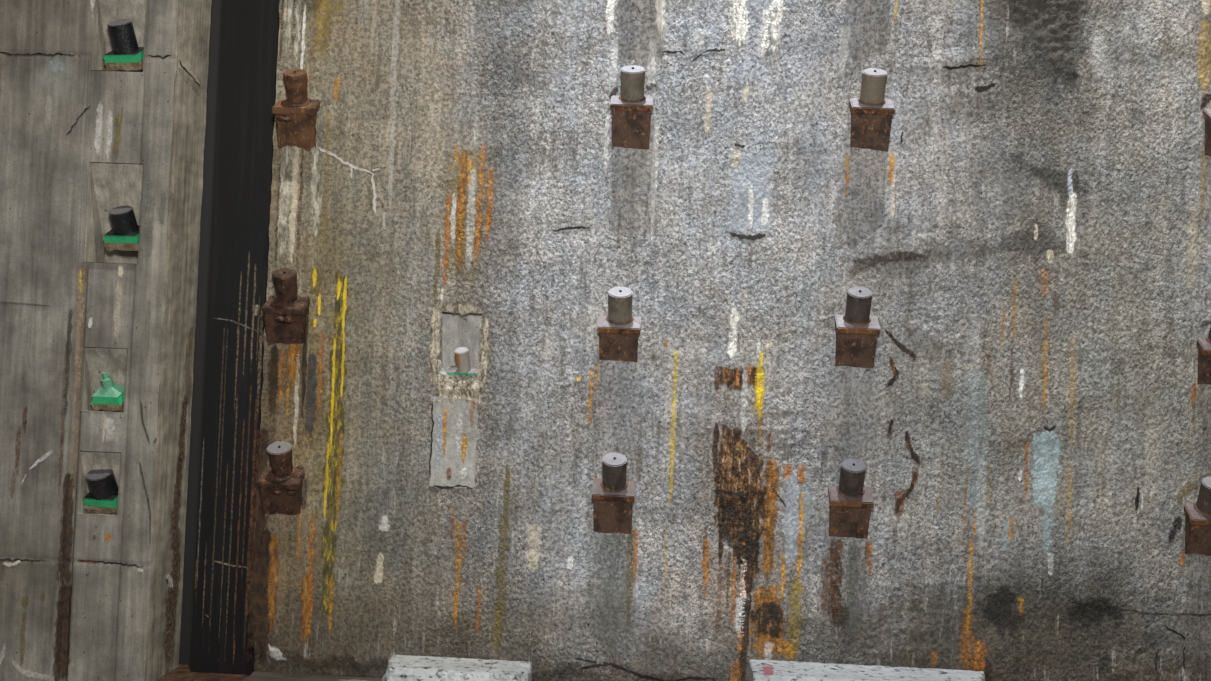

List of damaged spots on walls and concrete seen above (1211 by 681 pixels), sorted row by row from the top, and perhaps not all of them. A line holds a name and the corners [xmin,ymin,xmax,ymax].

crack [319,147,379,213]
rust [433,145,493,307]
rust [233,269,349,660]
rust [702,351,807,681]
water stain [1018,426,1061,550]
rust [966,541,986,671]